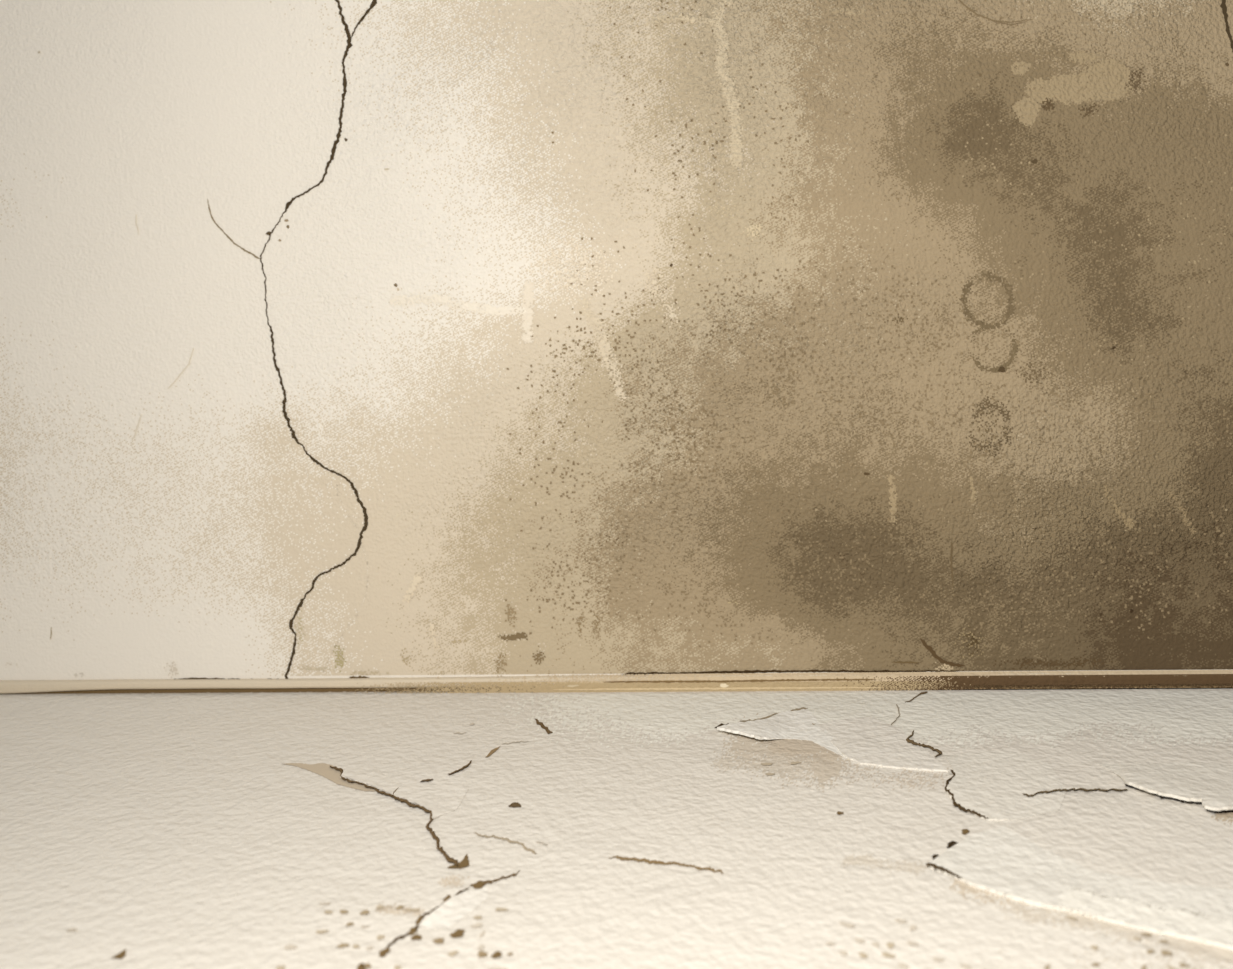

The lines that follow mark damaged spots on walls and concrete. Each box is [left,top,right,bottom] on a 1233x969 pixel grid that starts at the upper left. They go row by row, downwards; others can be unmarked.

crack [1220,0,1233,52]
crack [207,0,377,679]
leakage [0,0,1233,694]
crack [503,719,553,744]
crack [609,638,989,819]
spalling [286,763,376,791]
crack [1023,784,1233,812]
crack [330,732,548,948]
spalling [447,854,469,869]